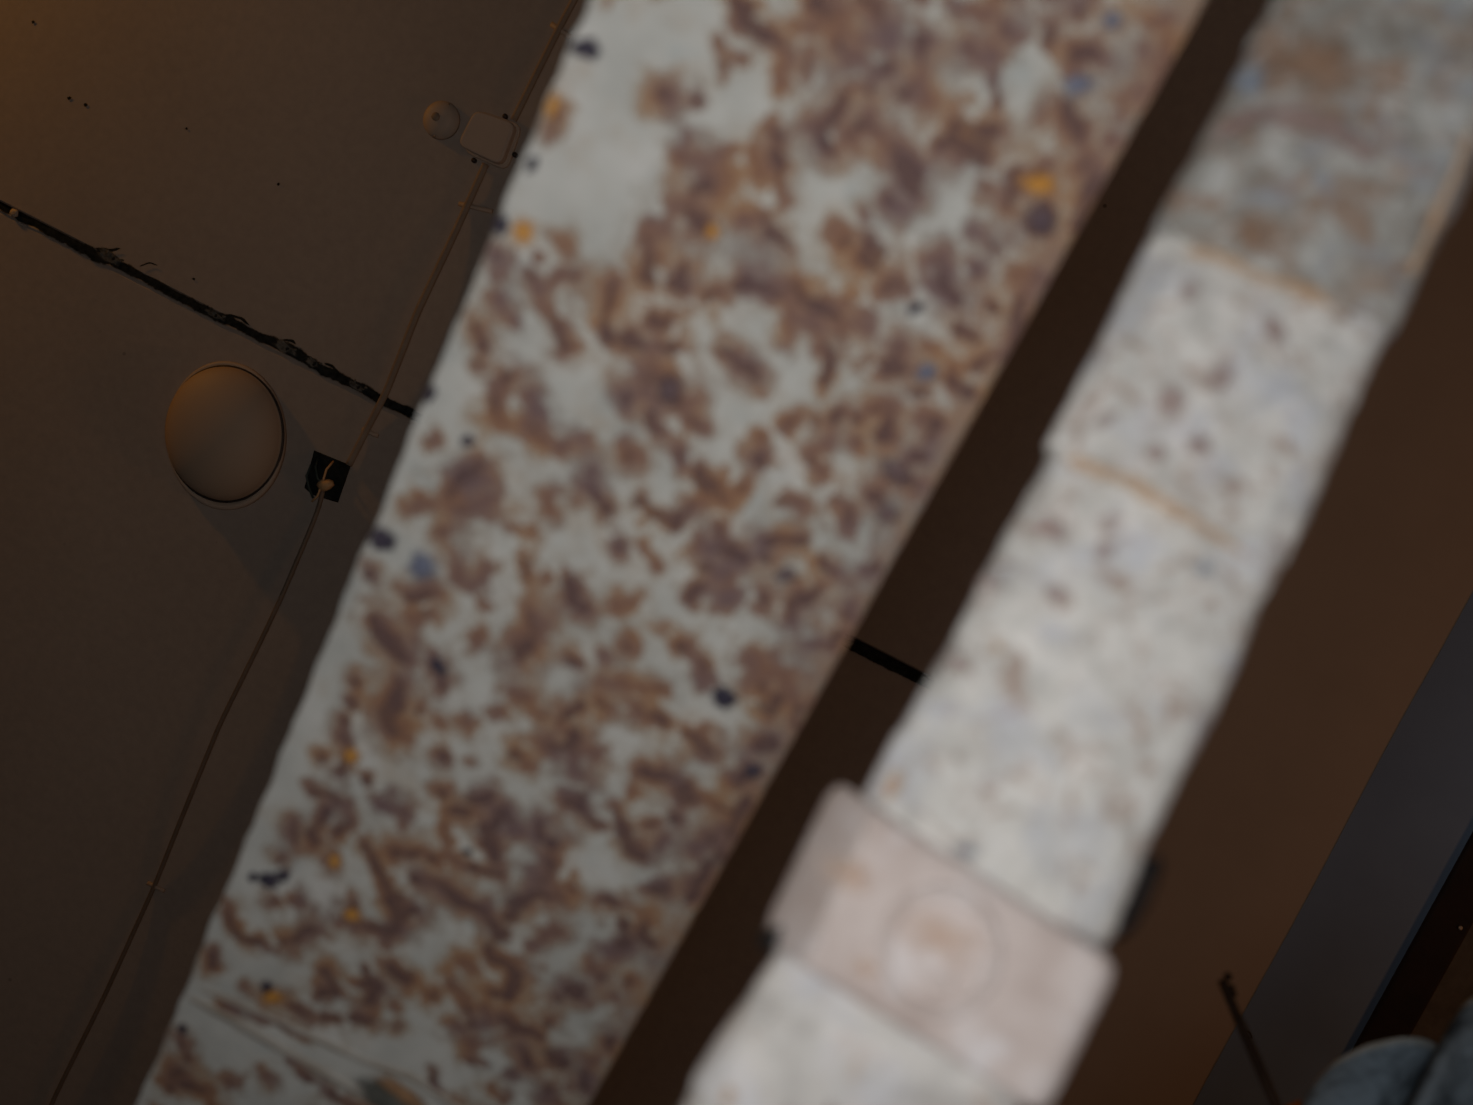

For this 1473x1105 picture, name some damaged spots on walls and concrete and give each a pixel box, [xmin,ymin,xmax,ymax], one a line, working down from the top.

crack [0,203,419,421]
rust [200,0,1204,1105]
crack [845,640,928,687]
rust [150,1027,372,1105]